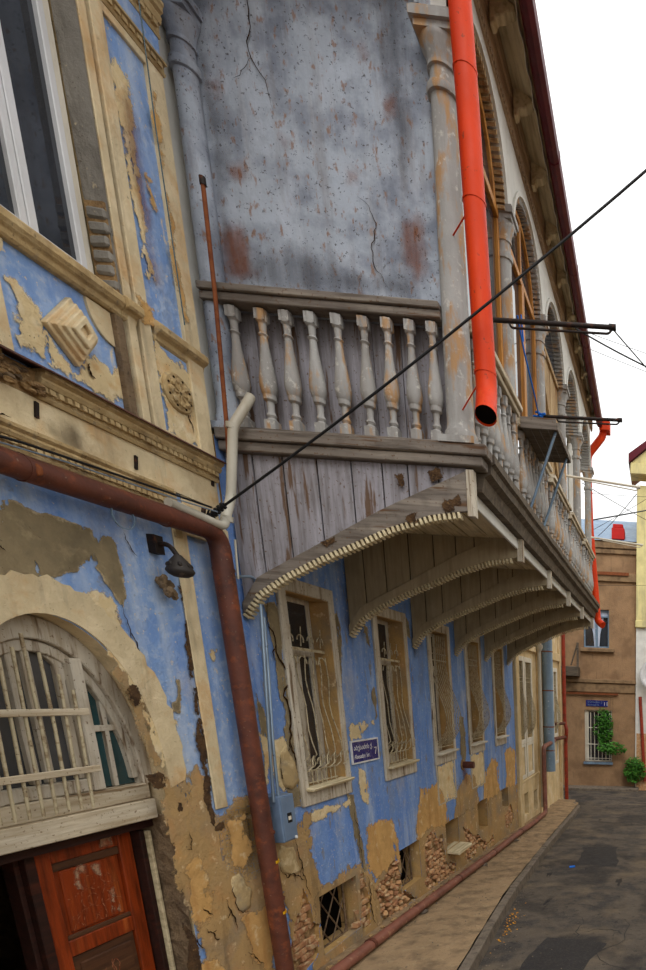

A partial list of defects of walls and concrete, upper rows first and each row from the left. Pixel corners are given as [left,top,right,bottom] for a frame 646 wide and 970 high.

crack [236,1,271,103]
peeling [110,57,189,323]
peeling [3,275,123,403]
peeling [135,293,199,447]
peeling [0,499,127,625]
peeling [106,585,275,970]
peeling [256,602,519,970]